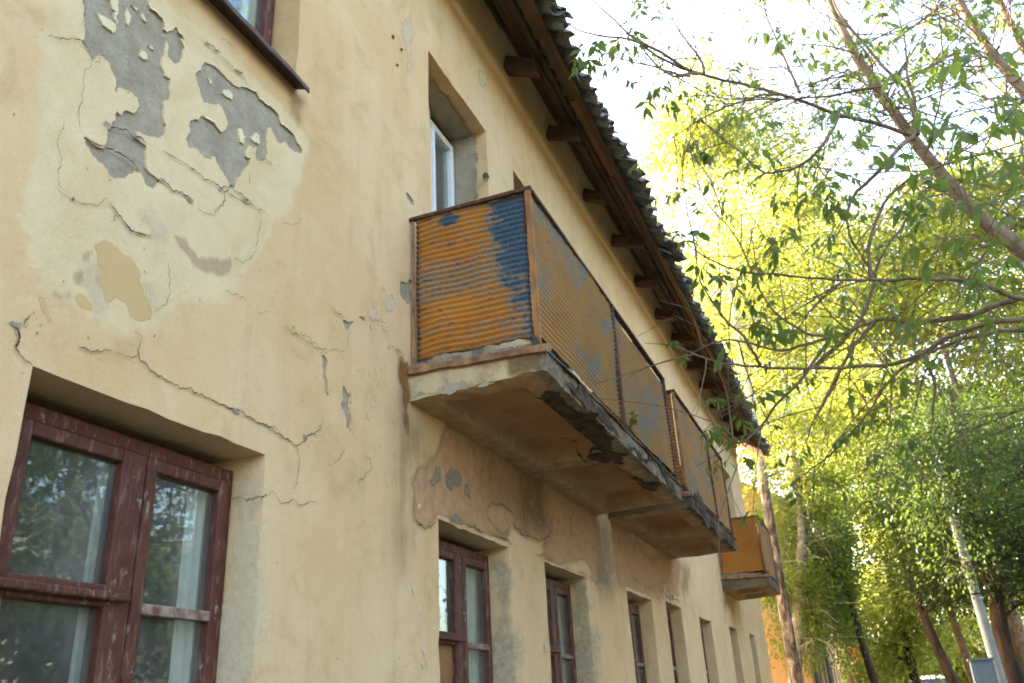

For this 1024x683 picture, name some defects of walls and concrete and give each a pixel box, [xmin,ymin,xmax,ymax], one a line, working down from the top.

flaking render [82,0,186,188]
crack [49,0,303,263]
flaking render [186,63,303,184]
crack [9,315,32,365]
crack [227,291,350,352]
crack [79,331,323,506]
flaking render [341,388,353,436]
flaking render [430,467,470,498]
damp [492,562,521,683]
damp [575,584,599,683]